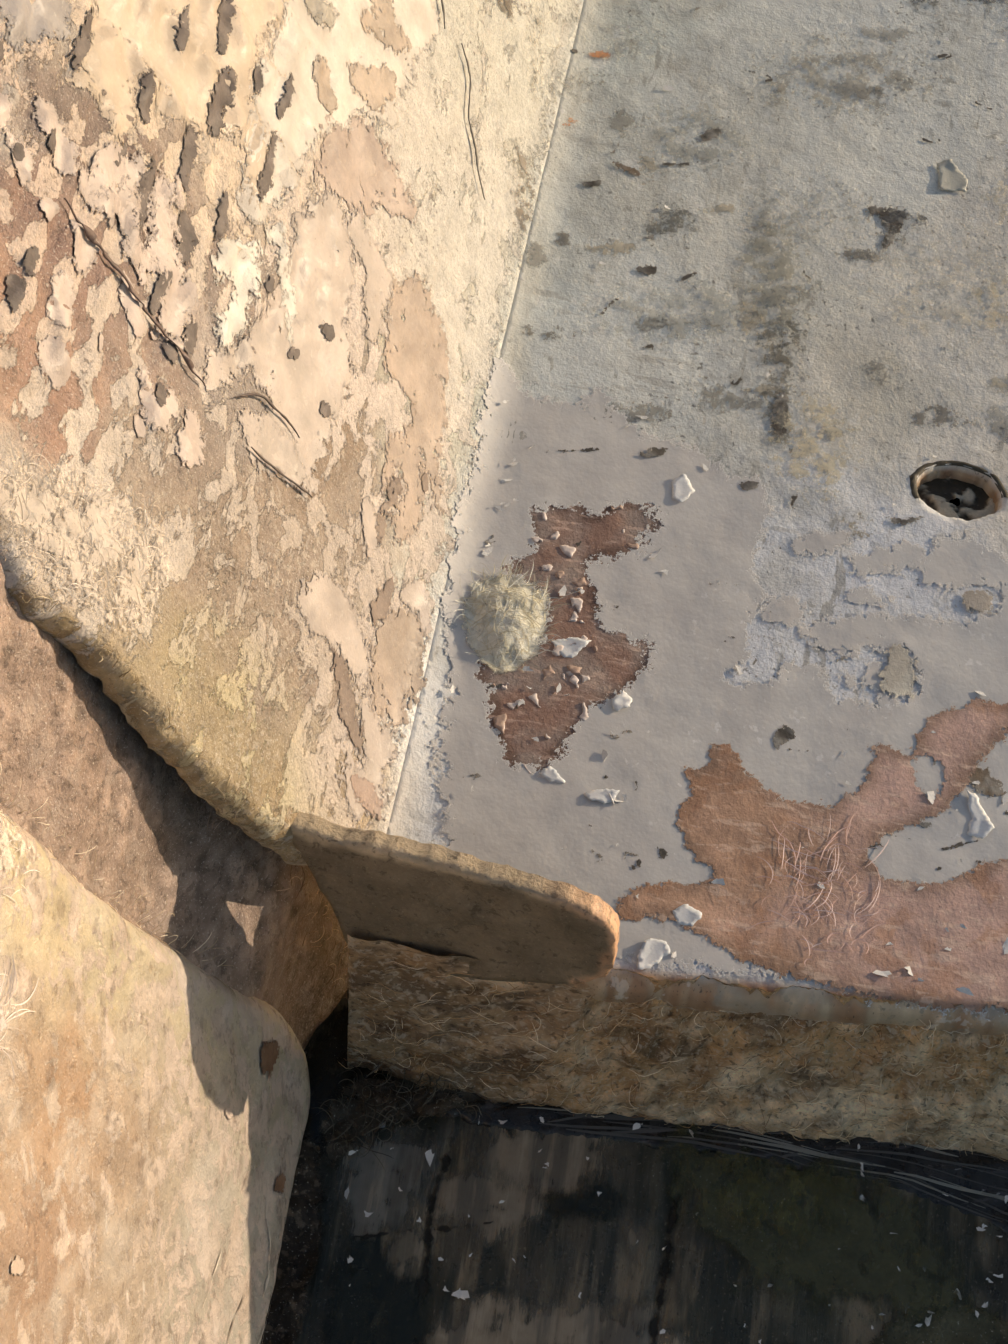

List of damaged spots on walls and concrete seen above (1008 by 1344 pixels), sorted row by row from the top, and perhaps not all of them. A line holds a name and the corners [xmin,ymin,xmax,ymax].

crack [64,198,205,386]
crack [235,392,300,438]
crack [251,447,312,497]
peeling [0,0,1008,1022]
peeling [11,1255,25,1276]